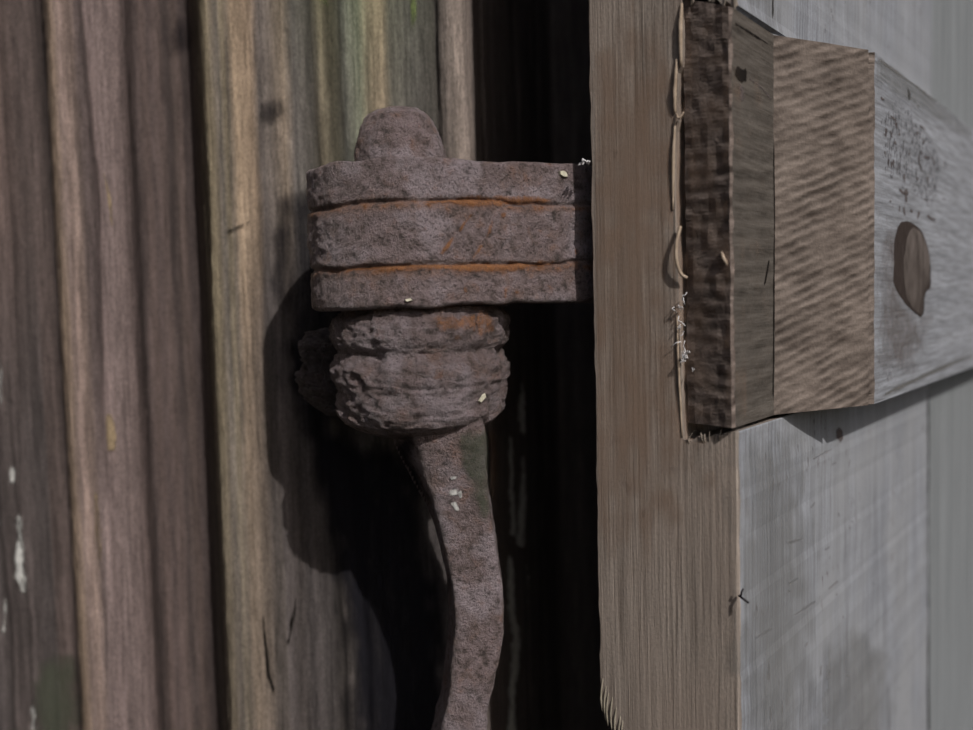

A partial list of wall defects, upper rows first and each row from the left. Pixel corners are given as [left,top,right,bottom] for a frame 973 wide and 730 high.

peeling [881,97,946,222]
corrosion [430,196,549,216]
corrosion [348,261,551,271]